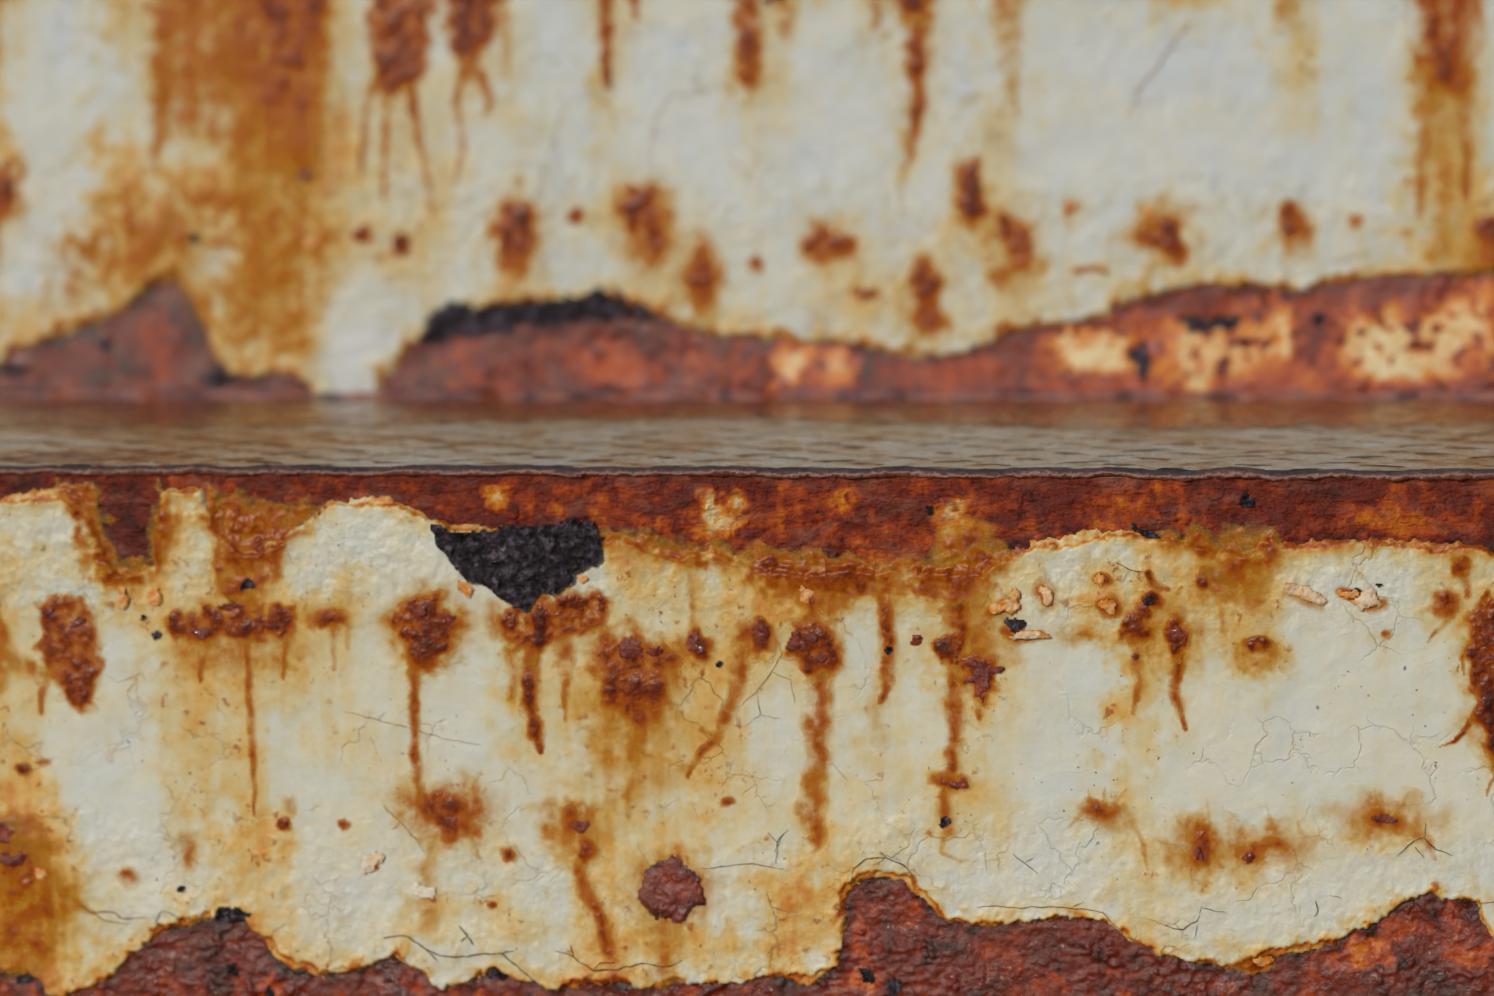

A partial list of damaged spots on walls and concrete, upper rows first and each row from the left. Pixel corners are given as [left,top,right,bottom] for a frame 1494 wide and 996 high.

corrosion [358,0,507,219]
corrosion [1413,0,1483,214]
peeling [0,277,311,392]
peeling [380,271,1494,393]
corrosion [0,594,104,715]
corrosion [57,483,348,815]
corrosion [384,589,485,847]
peeling [0,473,1494,613]
corrosion [489,525,1010,851]
corrosion [1092,569,1203,732]
corrosion [1429,555,1494,795]
peeling [0,877,1494,996]